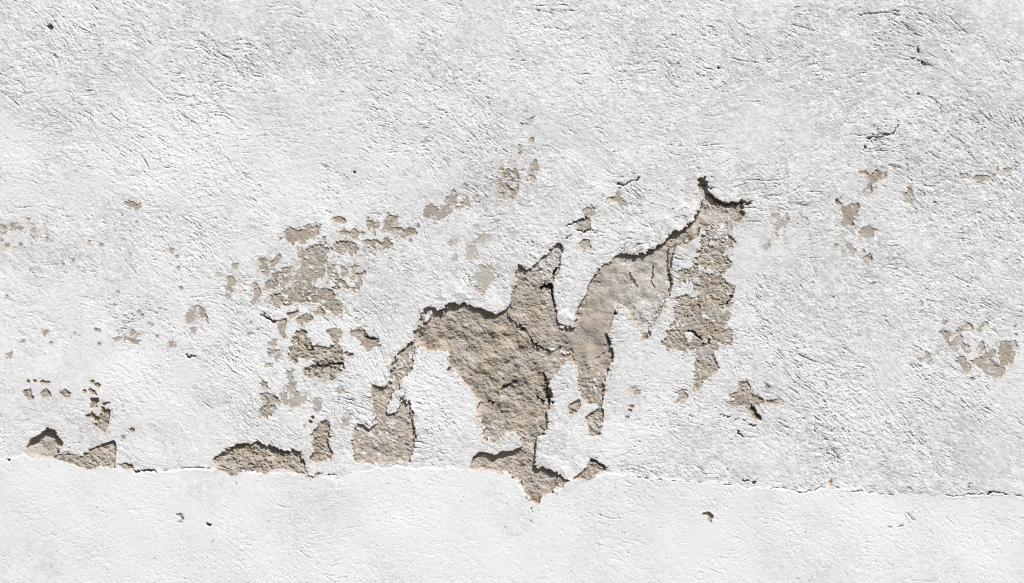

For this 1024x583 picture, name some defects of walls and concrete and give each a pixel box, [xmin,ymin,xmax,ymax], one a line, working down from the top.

peeling [834,165,897,264]
peeling [184,304,208,333]
flaking render [213,178,753,502]
peeling [918,319,1018,381]
flaking render [24,378,134,470]
peeling [728,380,784,420]
crack [135,466,210,474]
crack [945,484,1020,499]